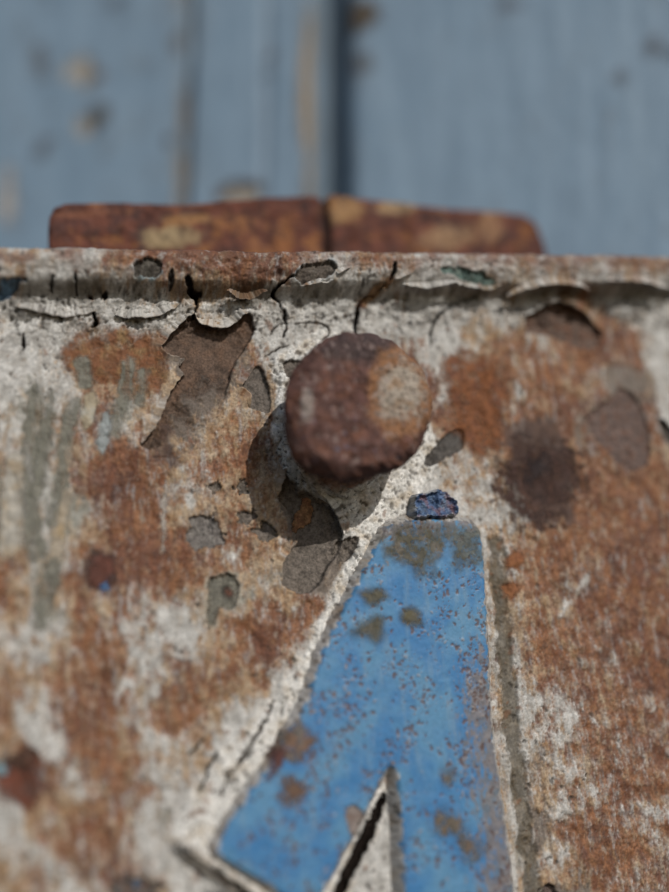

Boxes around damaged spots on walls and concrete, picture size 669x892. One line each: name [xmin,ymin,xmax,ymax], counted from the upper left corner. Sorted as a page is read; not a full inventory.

crack [185,275,202,321]
crack [265,275,330,357]
crack [353,261,397,333]
peeling [394,266,501,291]
peeling [507,276,604,351]
rust [62,326,167,399]
peeling [115,303,271,450]
rust [443,348,596,533]
peeling [275,465,359,594]
rust [89,550,117,592]
crack [333,792,386,892]
rust [435,811,480,860]